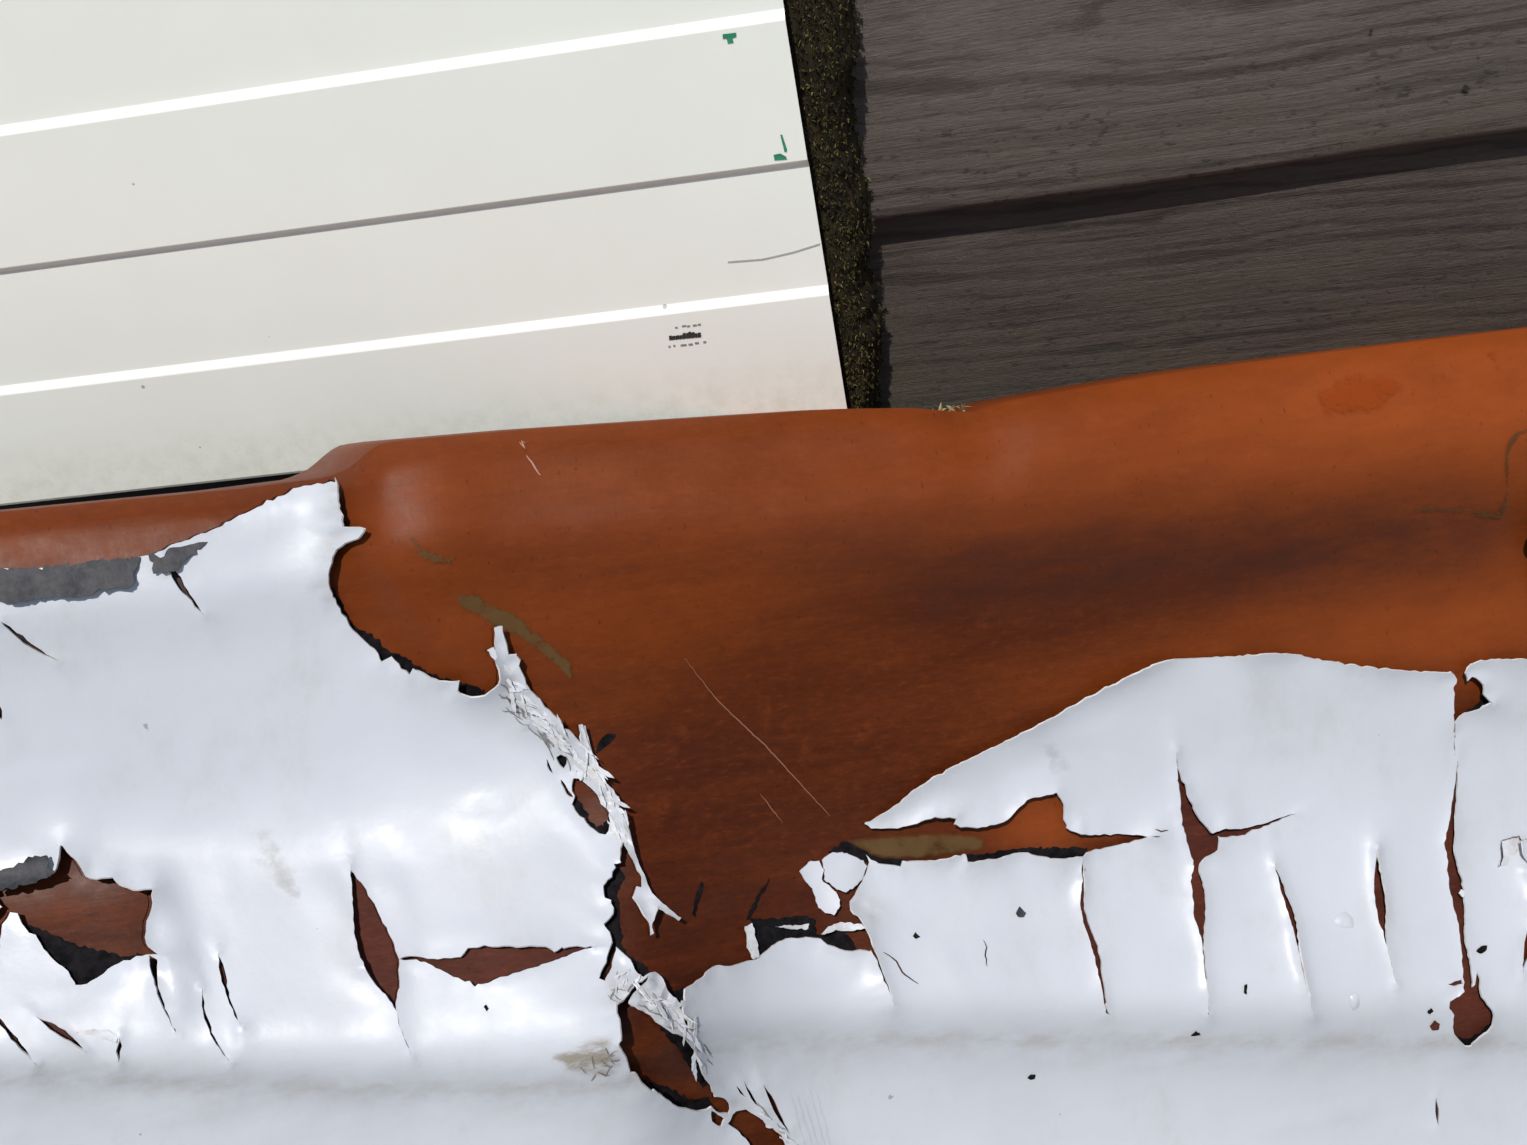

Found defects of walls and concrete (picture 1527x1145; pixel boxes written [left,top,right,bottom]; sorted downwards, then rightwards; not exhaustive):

peeling [0,328,1527,1081]
crack [1080,876,1107,1013]
crack [1153,769,1291,977]
crack [1276,870,1298,945]
crack [1374,859,1386,942]
crack [1444,773,1493,1045]
crack [1498,836,1527,867]
crack [1519,934,1527,966]